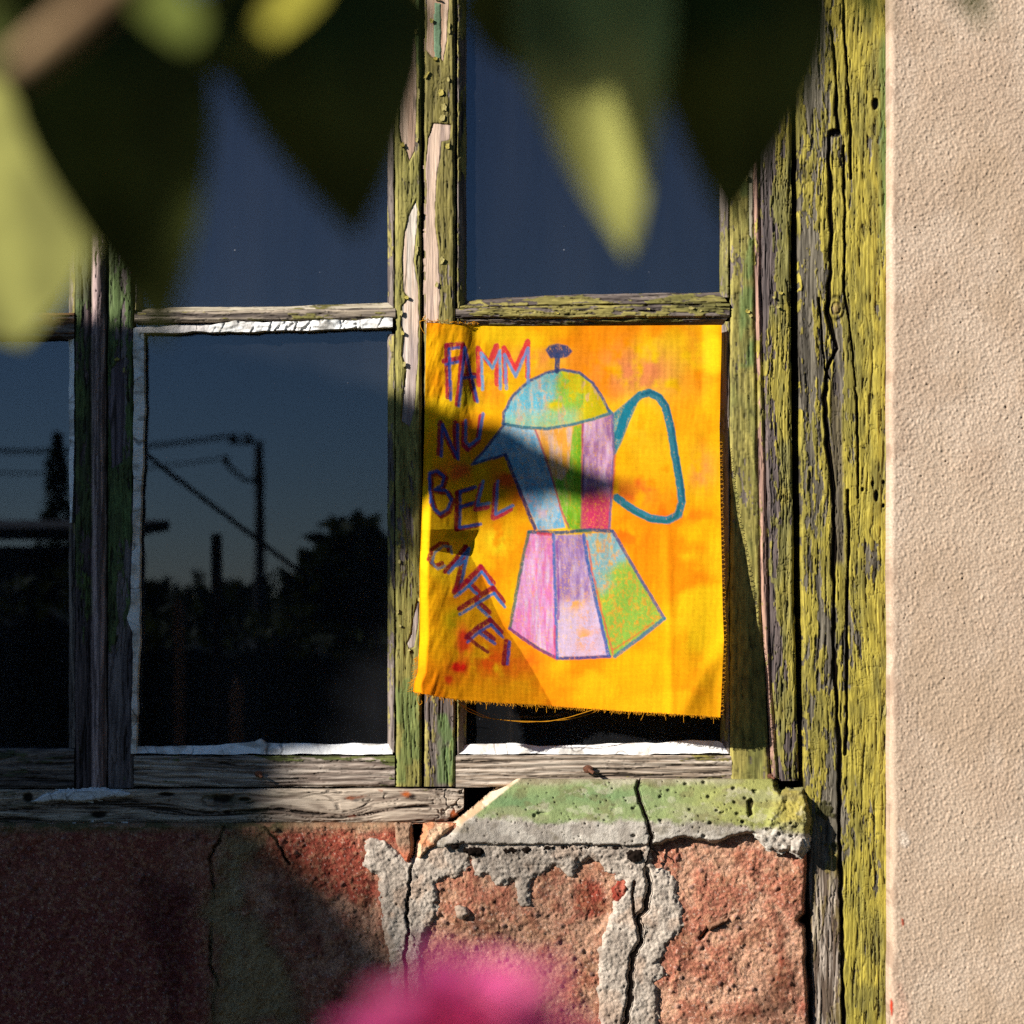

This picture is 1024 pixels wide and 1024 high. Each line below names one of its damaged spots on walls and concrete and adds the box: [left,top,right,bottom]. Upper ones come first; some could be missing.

peeling [425,0,450,79]
peeling [399,77,451,427]
crack [819,0,859,1024]
crack [403,866,415,987]
spalling [394,822,485,863]
spalling [503,845,644,863]
spalling [611,880,627,902]
crack [622,778,658,1024]
spalling [753,832,811,859]